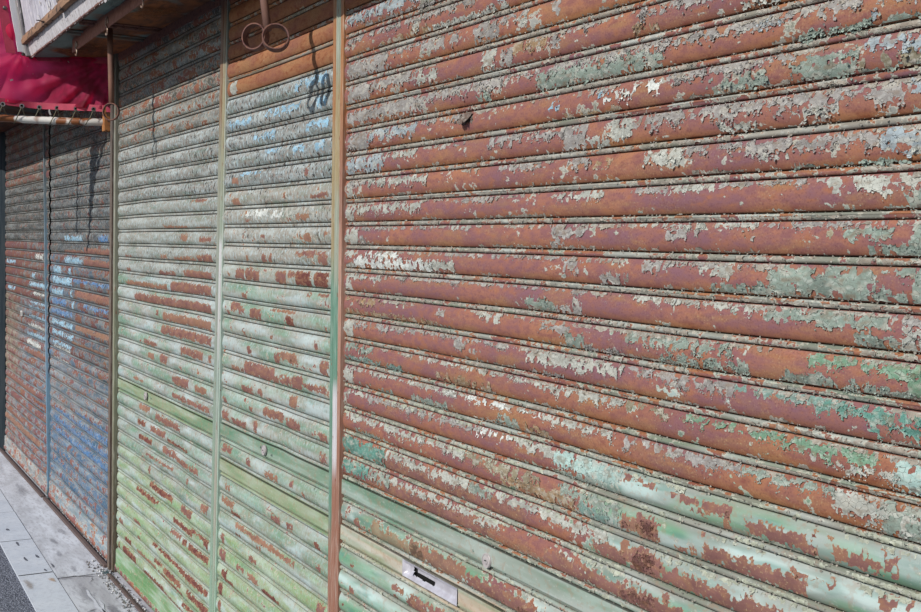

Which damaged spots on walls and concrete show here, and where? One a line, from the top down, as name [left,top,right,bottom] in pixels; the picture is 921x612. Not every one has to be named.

peeling [228,116,280,157]
peeling [264,70,329,155]
peeling [245,207,300,221]
peeling [27,256,109,363]
corrosion [125,253,213,366]
peeling [340,0,921,612]
corrosion [222,328,329,434]
corrosion [136,403,209,565]
corrosion [118,482,295,612]
corrosion [353,454,783,612]
corrosion [674,531,836,598]
corrosion [744,515,901,580]